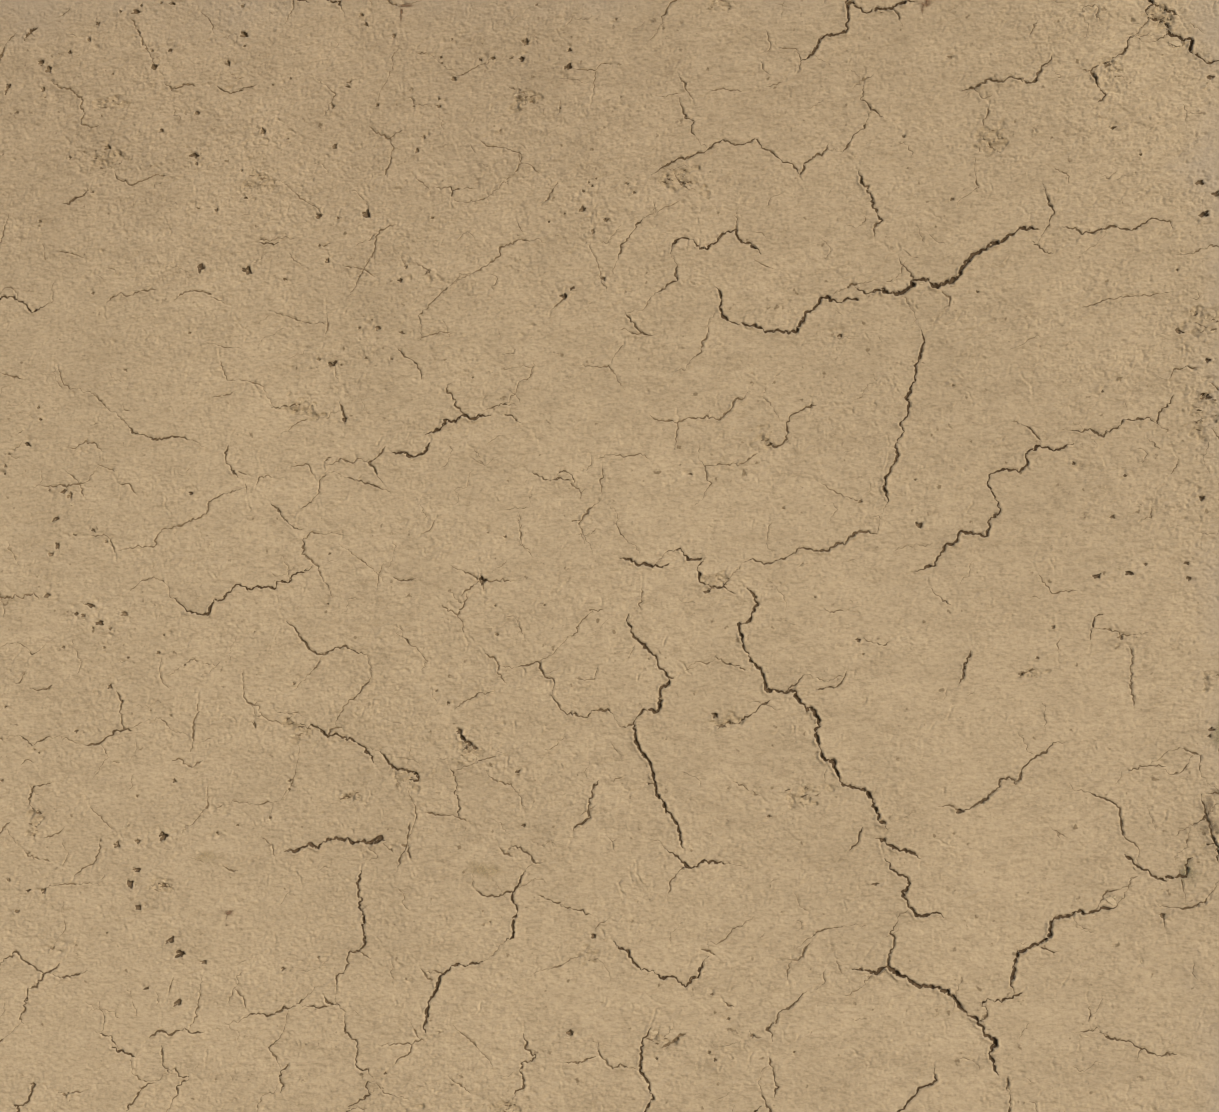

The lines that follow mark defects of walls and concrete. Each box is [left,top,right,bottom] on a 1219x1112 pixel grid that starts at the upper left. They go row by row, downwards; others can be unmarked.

crack [52,81,99,129]
crack [131,19,256,122]
crack [286,0,417,22]
crack [354,42,489,175]
crack [580,0,915,385]
crack [958,0,1219,202]
crack [0,141,558,616]
crack [0,622,764,1112]